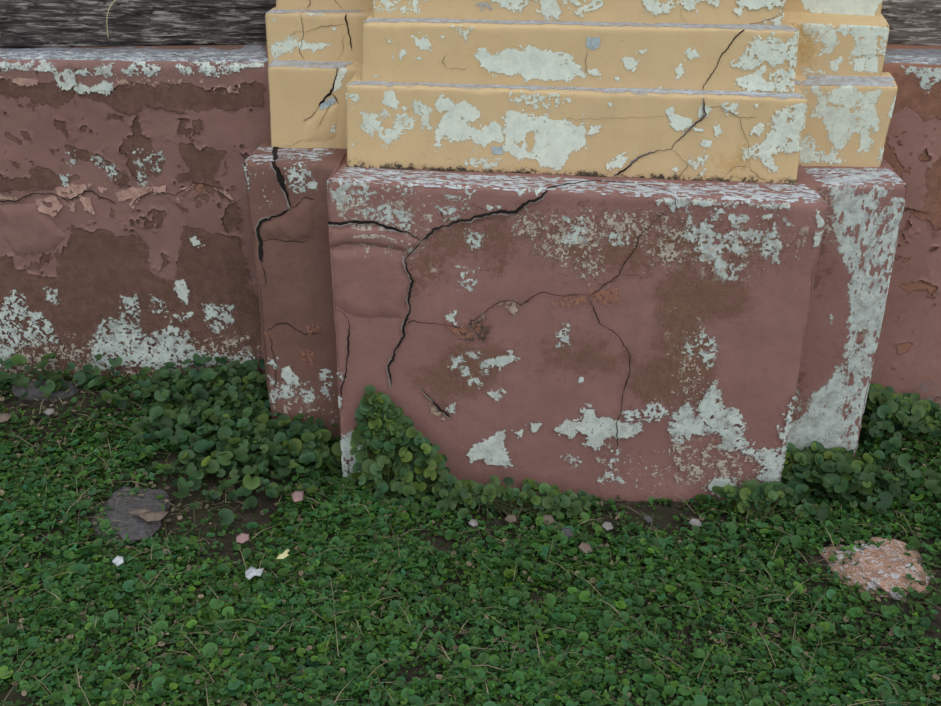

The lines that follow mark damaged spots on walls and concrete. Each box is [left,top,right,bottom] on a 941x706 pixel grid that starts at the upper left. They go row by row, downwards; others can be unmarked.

crack [268,323,320,394]
crack [250,1,352,286]
peeling [0,0,941,506]
crack [328,4,785,446]